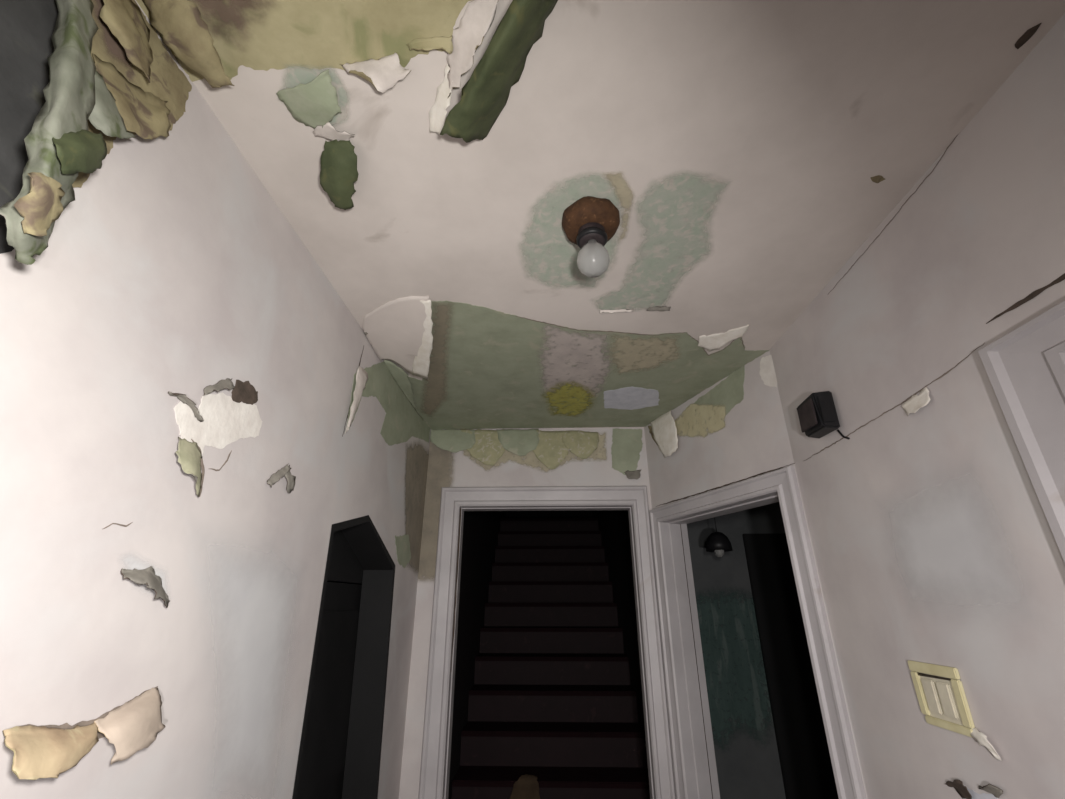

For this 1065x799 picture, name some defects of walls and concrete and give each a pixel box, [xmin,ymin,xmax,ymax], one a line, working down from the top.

peeling [0,0,558,265]
peeling [522,173,725,313]
flaking render [168,378,262,497]
peeling [267,463,296,493]
peeling [342,296,777,480]
crack [656,273,1065,507]
peeling [120,558,170,608]
peeling [3,686,165,780]
flaking render [946,779,1003,799]